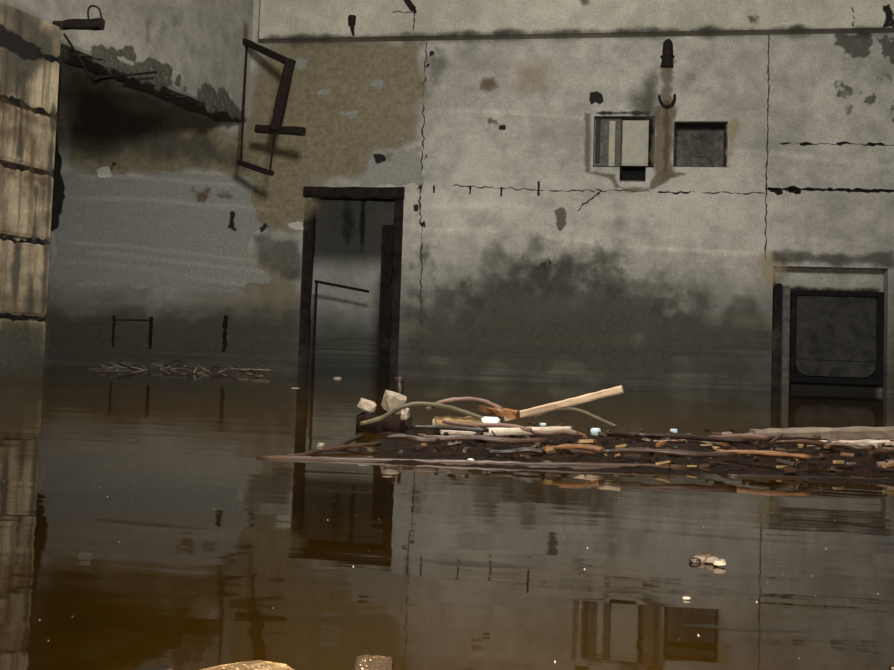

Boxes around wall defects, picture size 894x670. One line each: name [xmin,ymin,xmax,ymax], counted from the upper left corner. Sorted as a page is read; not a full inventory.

peeling [52,42,423,290]
crack [453,35,894,261]
peeling [836,81,876,104]
peeling [835,33,894,64]
leakage [405,256,746,383]